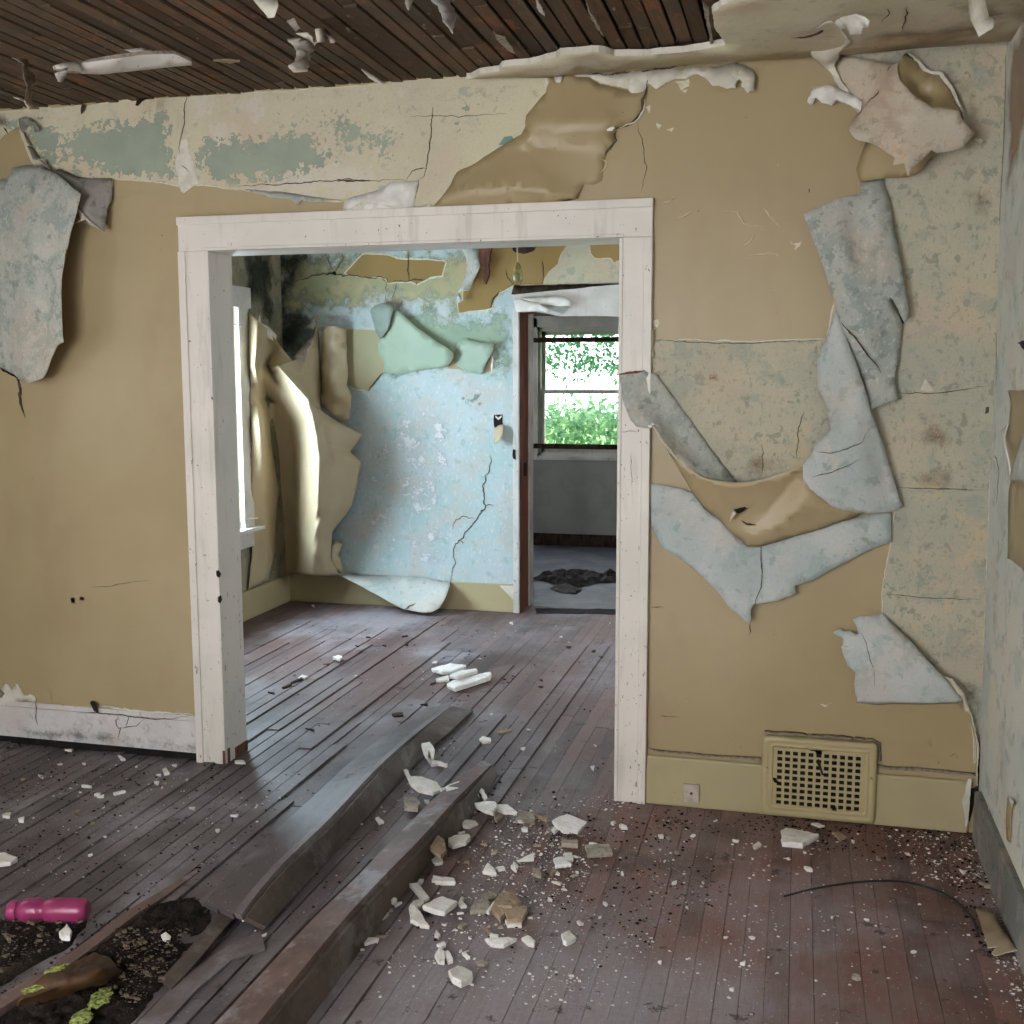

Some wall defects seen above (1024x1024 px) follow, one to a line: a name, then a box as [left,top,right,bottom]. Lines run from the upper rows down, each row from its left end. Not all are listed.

crack [244,110,504,198]
damp [248,255,309,351]
crack [17,379,25,416]
peeling [0,0,1024,764]
crack [450,457,492,581]